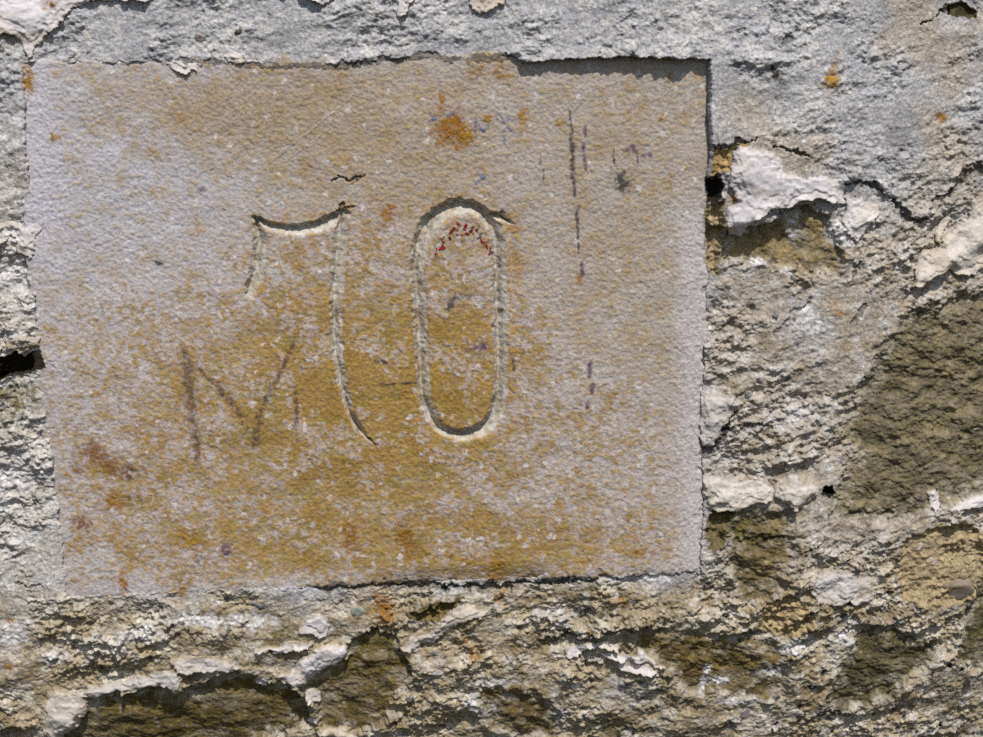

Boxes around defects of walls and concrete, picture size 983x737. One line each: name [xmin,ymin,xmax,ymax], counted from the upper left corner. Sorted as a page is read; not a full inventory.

flaking render [0,0,150,59]
flaking render [396,0,414,17]
flaking render [469,0,505,14]
flaking render [704,142,880,276]
flaking render [912,192,983,287]
flaking render [831,287,983,673]
flaking render [565,467,877,702]
flaking render [40,596,491,737]
flaking render [474,685,560,737]
flaking render [825,624,942,712]